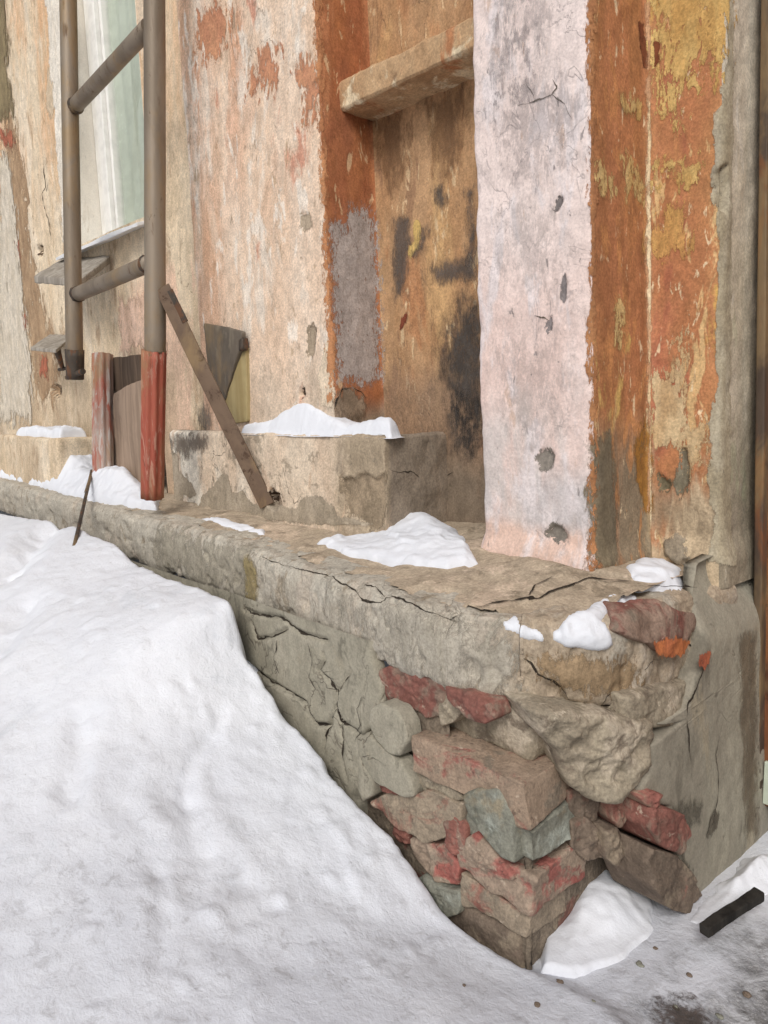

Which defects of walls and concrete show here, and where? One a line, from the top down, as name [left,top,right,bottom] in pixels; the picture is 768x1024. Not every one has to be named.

peeling [193,0,234,70]
crack [518,79,571,117]
peeling [244,0,386,408]
flaking render [583,0,738,572]
damp [440,298,482,458]
peeling [171,450,388,532]
crack [260,556,690,641]
crack [247,609,361,757]